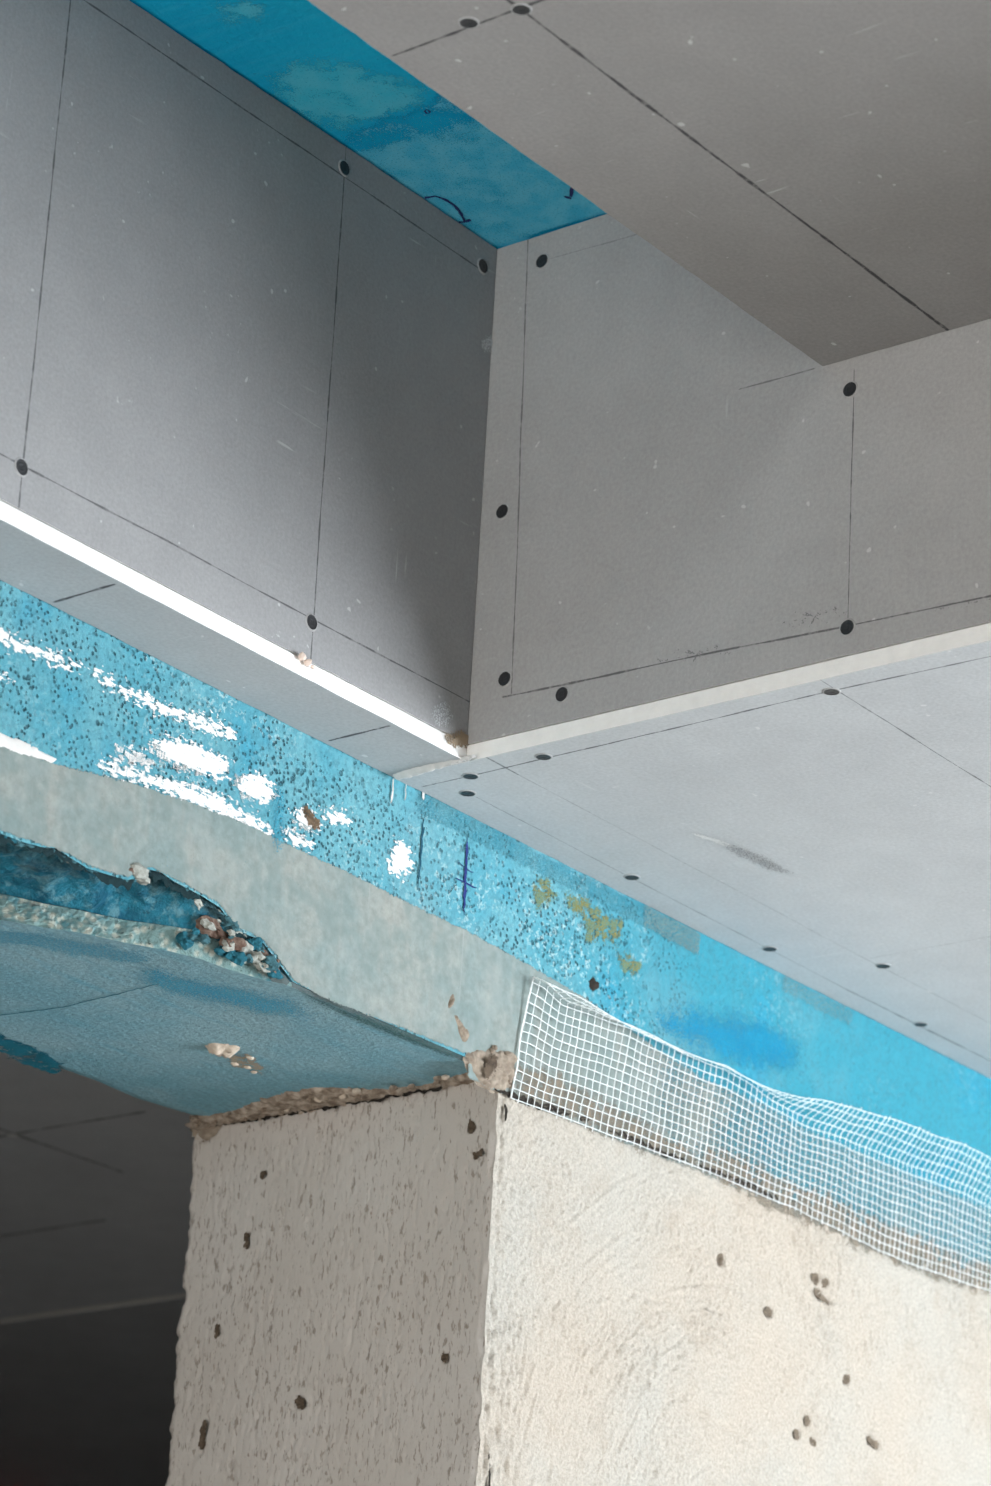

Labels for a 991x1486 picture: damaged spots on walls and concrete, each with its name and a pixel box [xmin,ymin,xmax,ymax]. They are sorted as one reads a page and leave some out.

spalling [0,833,293,986]
spalling [185,994,518,1142]
spalling [467,1119,483,1160]